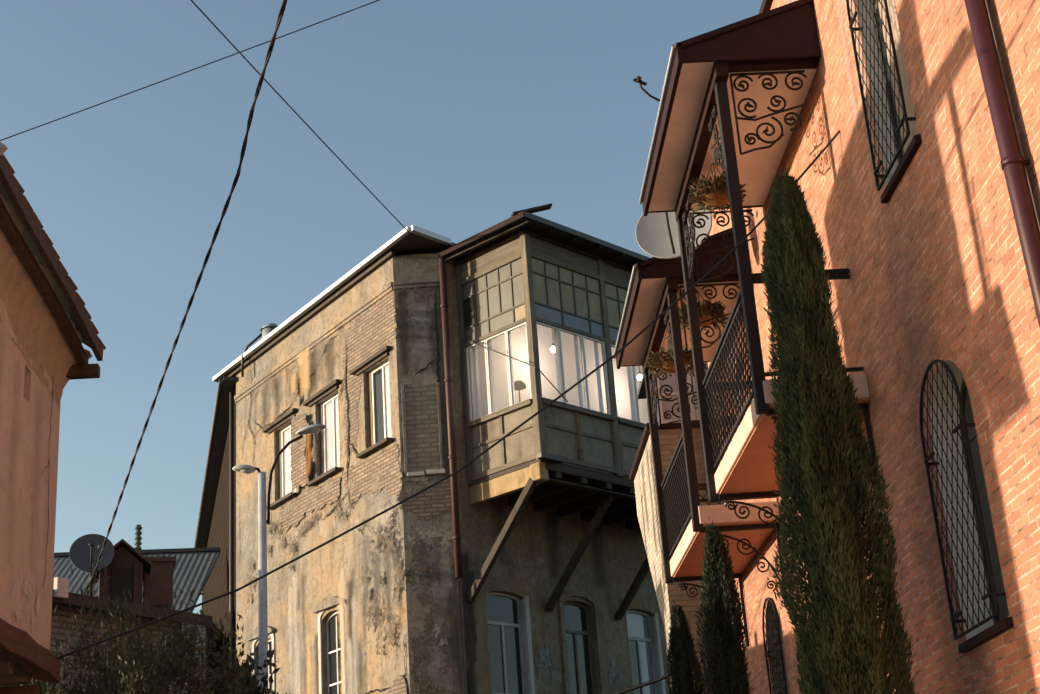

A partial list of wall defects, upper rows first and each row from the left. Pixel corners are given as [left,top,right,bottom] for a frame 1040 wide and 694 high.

crack [41,376,54,587]
crack [242,327,358,520]
flaking render [267,290,454,694]